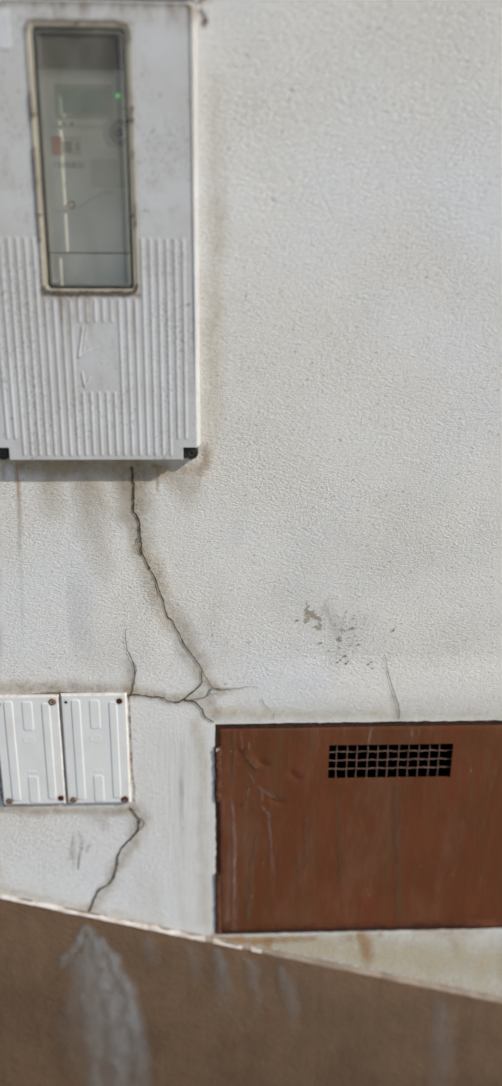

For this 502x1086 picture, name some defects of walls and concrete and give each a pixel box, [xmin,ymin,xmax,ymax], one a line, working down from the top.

crack [125,466,274,723]
crack [88,807,145,912]
water stain [77,926,139,1052]